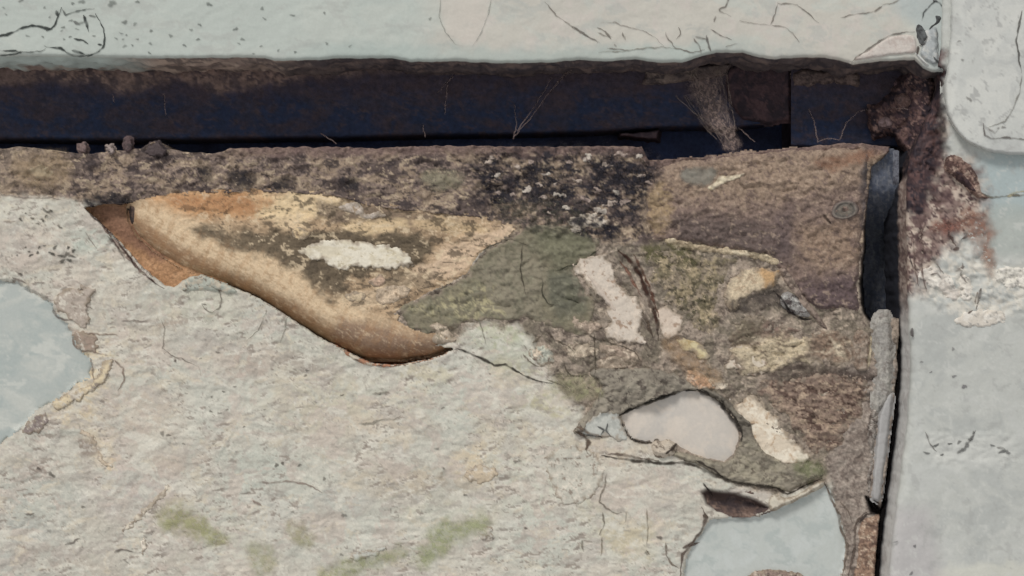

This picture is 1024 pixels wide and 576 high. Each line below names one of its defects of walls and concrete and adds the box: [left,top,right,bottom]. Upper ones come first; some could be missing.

crack [983,12,1024,140]
water stain [85,192,130,207]
mould [229,170,256,186]
mould [273,177,295,189]
mould [470,146,657,241]
peeling [646,16,941,312]
peeling [0,280,113,446]
flaking render [85,188,646,369]
crack [455,250,659,395]
peeling [544,307,810,505]
peeling [122,484,170,532]
peeling [684,481,881,576]